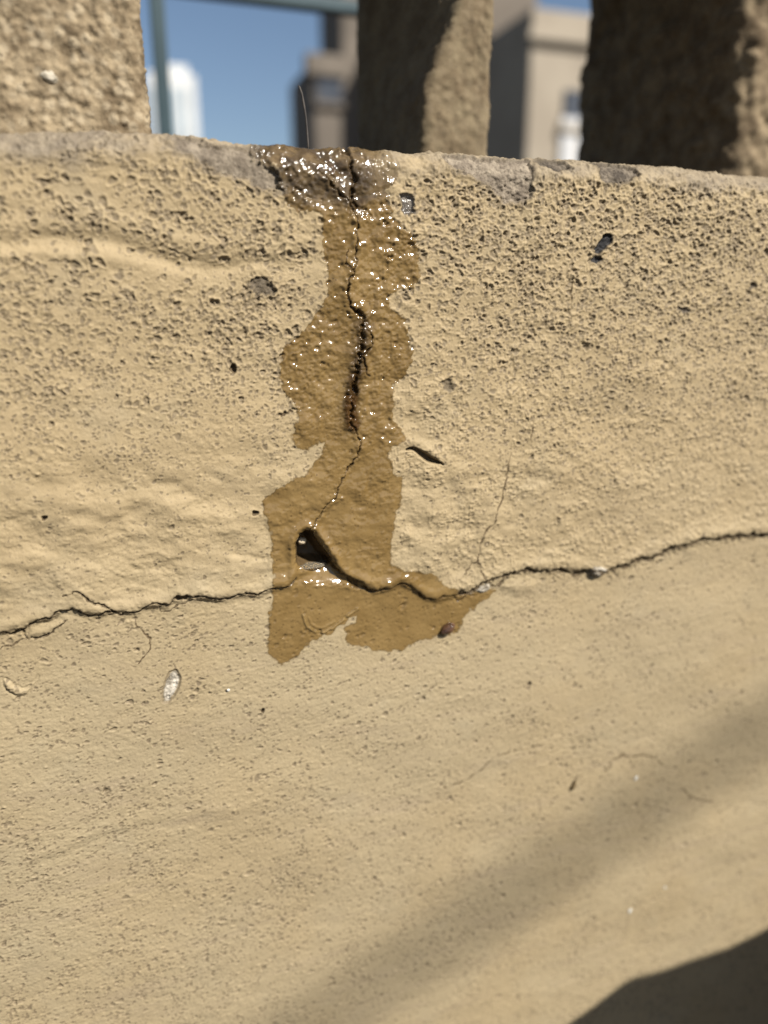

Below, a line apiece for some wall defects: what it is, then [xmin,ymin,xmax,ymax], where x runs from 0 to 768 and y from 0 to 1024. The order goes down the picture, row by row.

crack [318,151,373,395]
leakage [250,144,496,665]
crack [307,430,361,531]
crack [322,462,765,601]
crack [0,578,296,664]